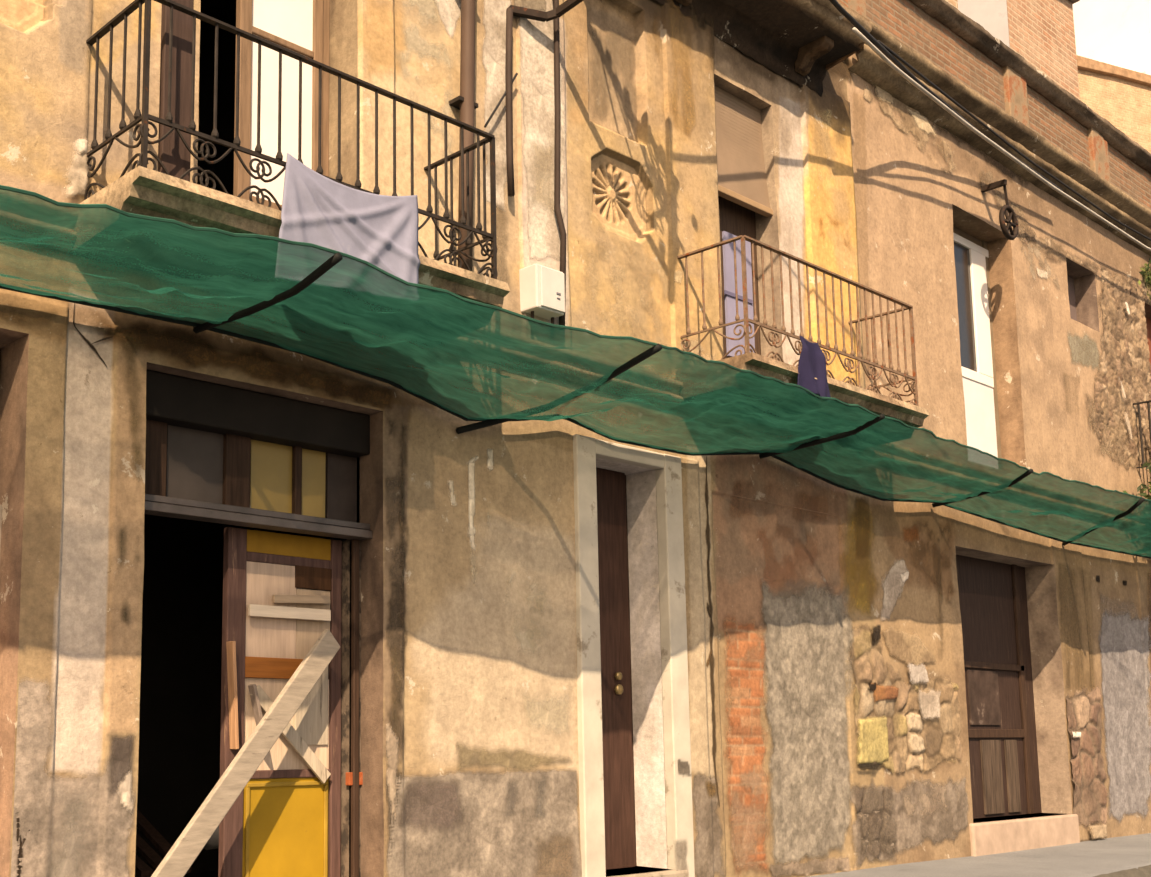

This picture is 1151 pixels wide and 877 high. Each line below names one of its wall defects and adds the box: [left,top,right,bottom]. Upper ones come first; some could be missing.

peeling [410,0,461,37]
peeling [483,0,566,283]
crack [73,303,111,367]
flaking render [863,85,1151,468]
damp [387,745,582,877]
flaking render [724,619,768,872]
flaking render [849,560,962,773]
damp [850,778,968,866]